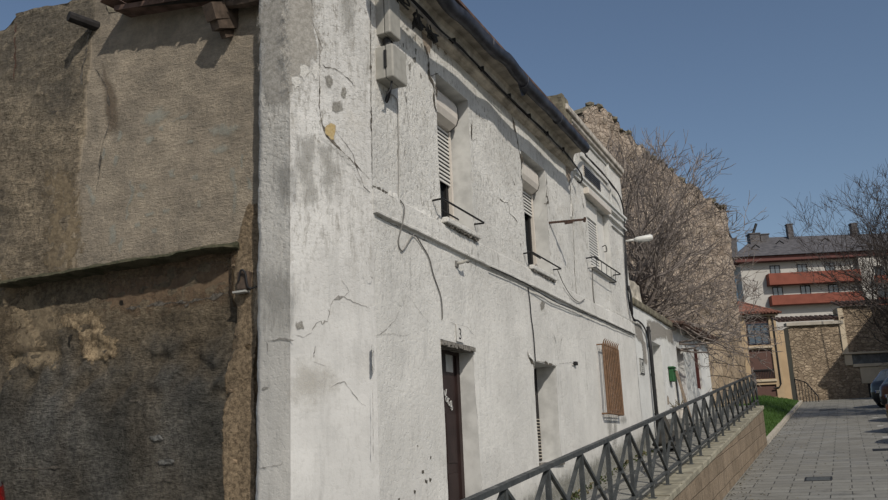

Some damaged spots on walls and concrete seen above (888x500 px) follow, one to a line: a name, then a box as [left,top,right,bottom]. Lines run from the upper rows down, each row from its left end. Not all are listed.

peeling [258,0,333,104]
flaking render [333,87,346,112]
crack [311,0,440,219]
crack [266,282,369,366]